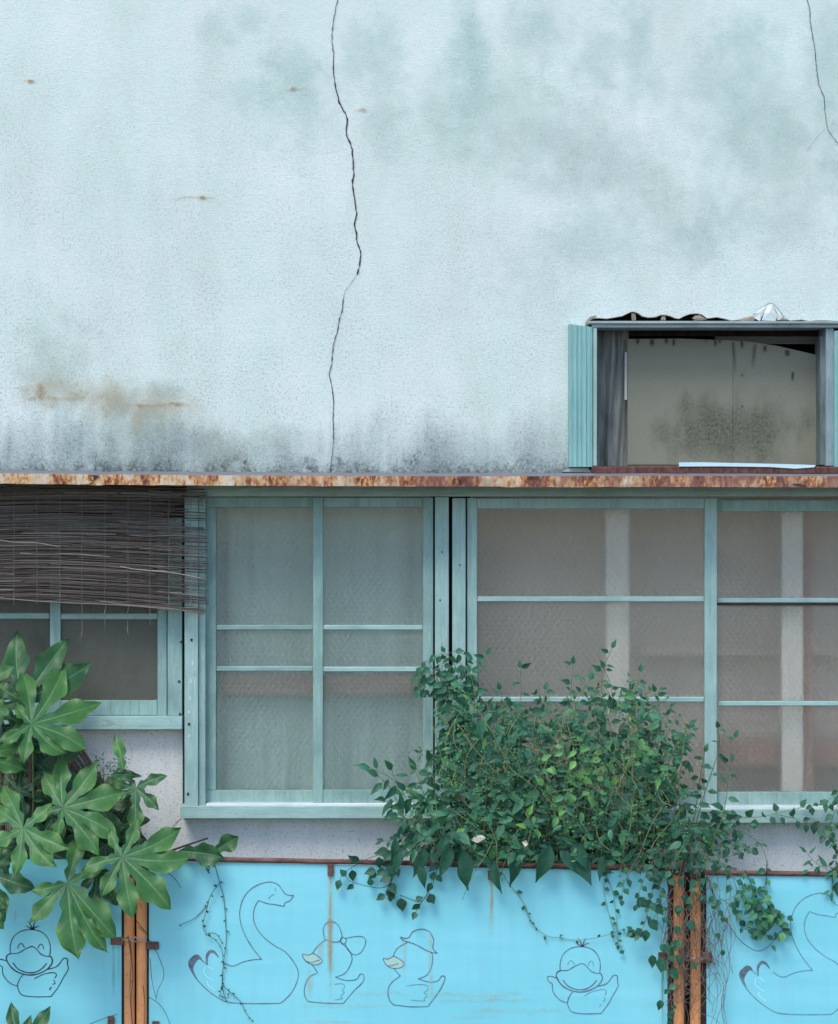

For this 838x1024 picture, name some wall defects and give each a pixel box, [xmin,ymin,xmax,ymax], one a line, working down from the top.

crack [807,0,838,150]
crack [329,0,361,472]
water stain [94,445,189,472]